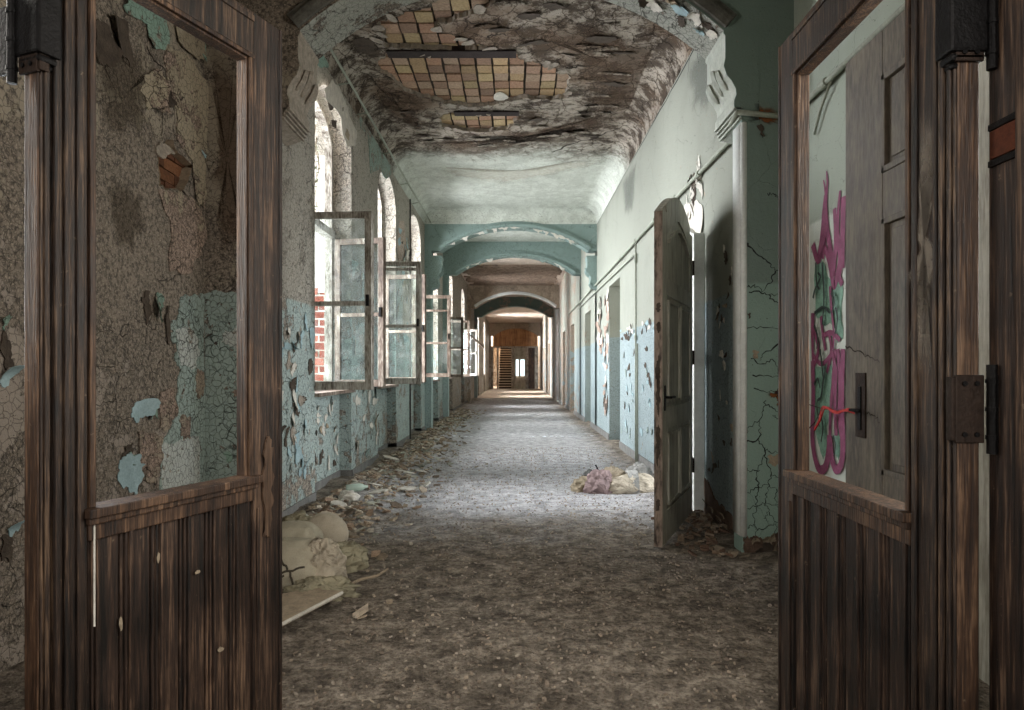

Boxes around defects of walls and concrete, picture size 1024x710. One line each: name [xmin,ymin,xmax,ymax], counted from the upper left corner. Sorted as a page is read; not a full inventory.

peeling [96,0,209,275]
spalling [353,0,638,147]
peeling [638,0,718,40]
peeling [0,315,25,388]
peeling [117,290,237,495]
peeling [282,314,339,480]
peeling [356,267,378,335]
peeling [355,387,379,456]
spalling [595,211,663,548]
crack [747,326,778,536]
peeling [0,520,25,562]